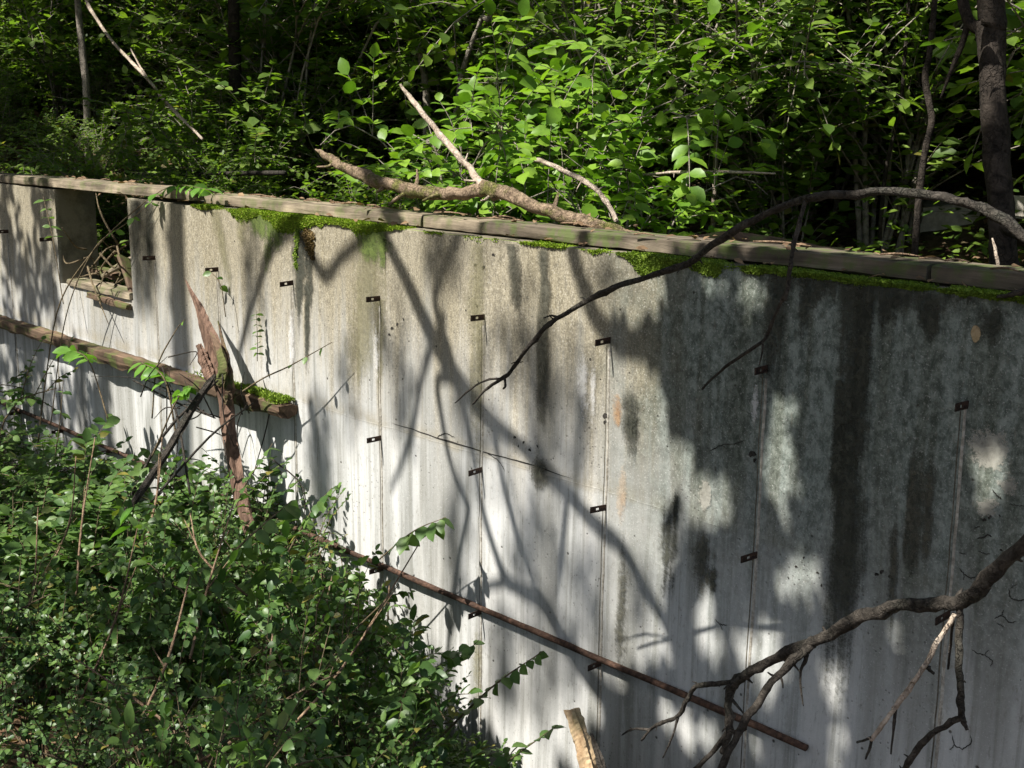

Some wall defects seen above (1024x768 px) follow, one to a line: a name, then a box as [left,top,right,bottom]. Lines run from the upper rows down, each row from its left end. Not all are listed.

leakage [357,227,391,268]
leakage [621,393,638,453]
leakage [762,274,971,688]
leakage [661,495,678,597]